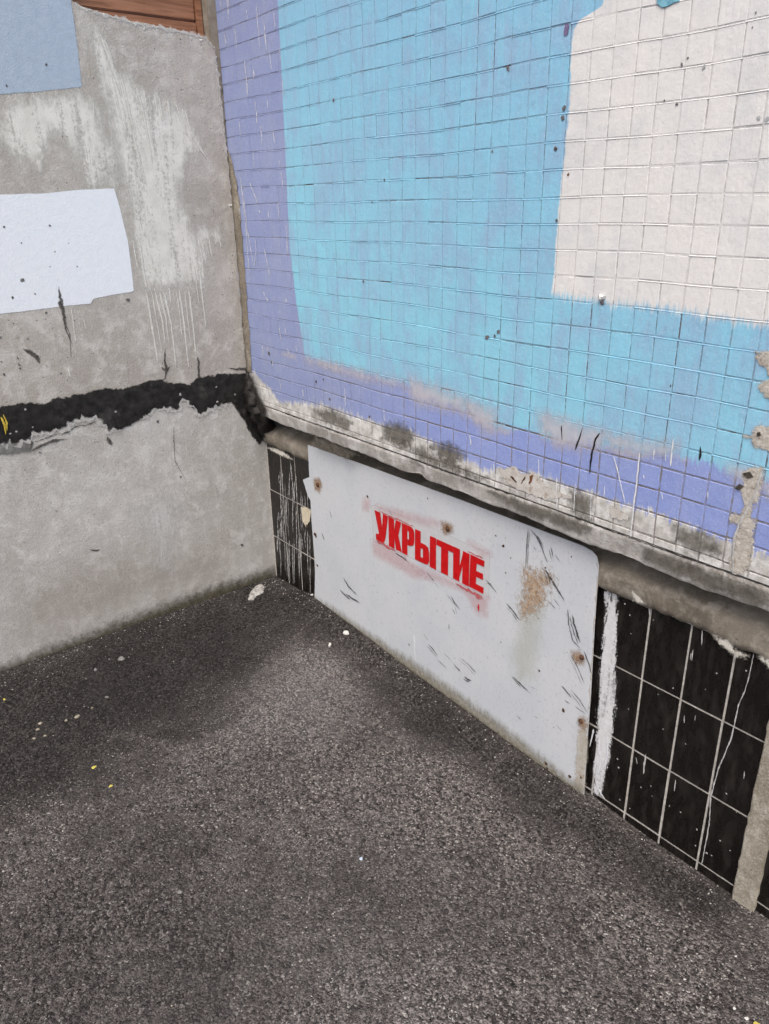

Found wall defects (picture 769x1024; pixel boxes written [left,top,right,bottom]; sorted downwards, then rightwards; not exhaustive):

crack [58,290,71,351]
spalling [755,350,769,399]
crack [28,437,64,451]
damp [310,437,355,459]
damp [383,408,495,479]
spalling [743,423,769,451]
peeling [499,466,572,500]
spalling [729,466,769,575]